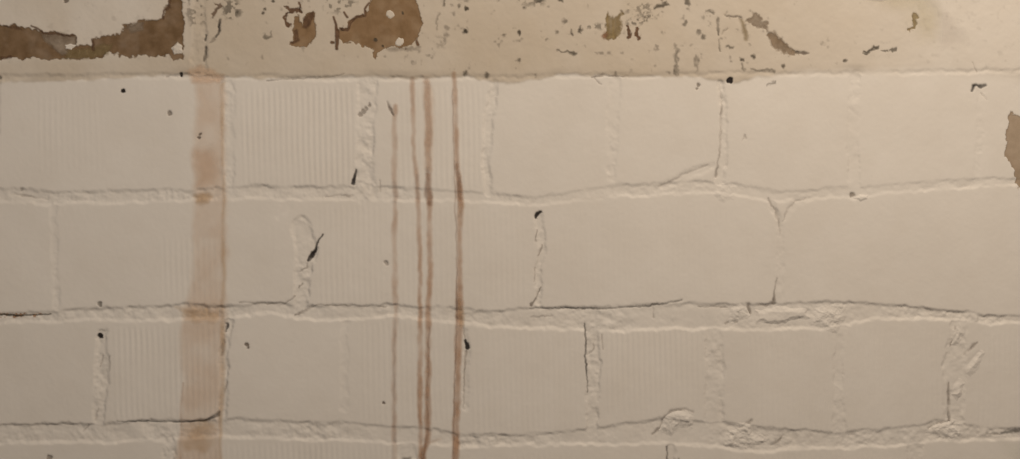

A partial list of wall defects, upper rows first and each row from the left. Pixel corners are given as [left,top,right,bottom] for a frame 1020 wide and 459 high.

peeling [0,0,185,60]
peeling [283,2,316,47]
peeling [331,0,423,59]
peeling [603,13,640,40]
spalling [728,13,808,55]
peeling [1005,112,1020,187]
crack [307,234,323,261]